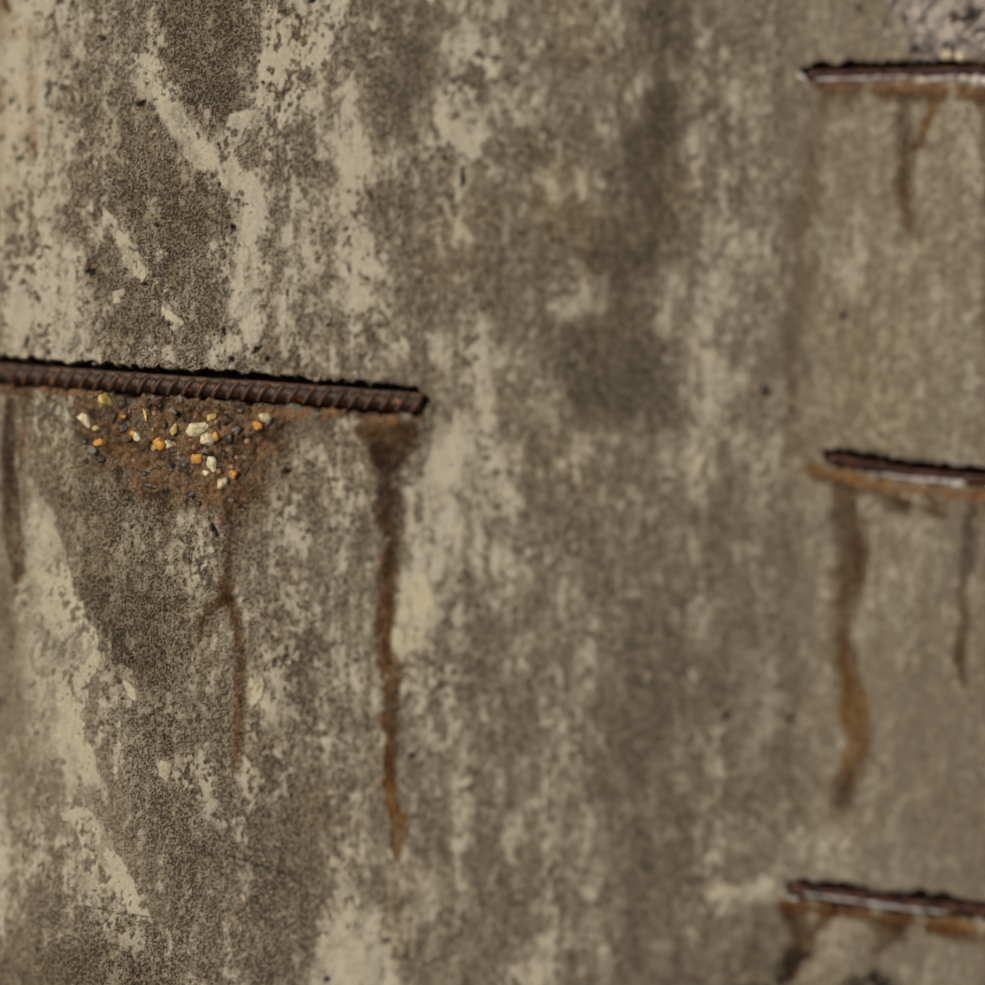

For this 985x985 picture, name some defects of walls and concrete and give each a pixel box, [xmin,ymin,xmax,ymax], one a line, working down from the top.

spalling [801,0,985,103]
spalling [0,354,430,512]
spalling [802,448,985,506]
corrosion [355,422,417,699]
corrosion [382,711,403,857]
peeling [707,883,745,901]
spalling [763,878,985,938]